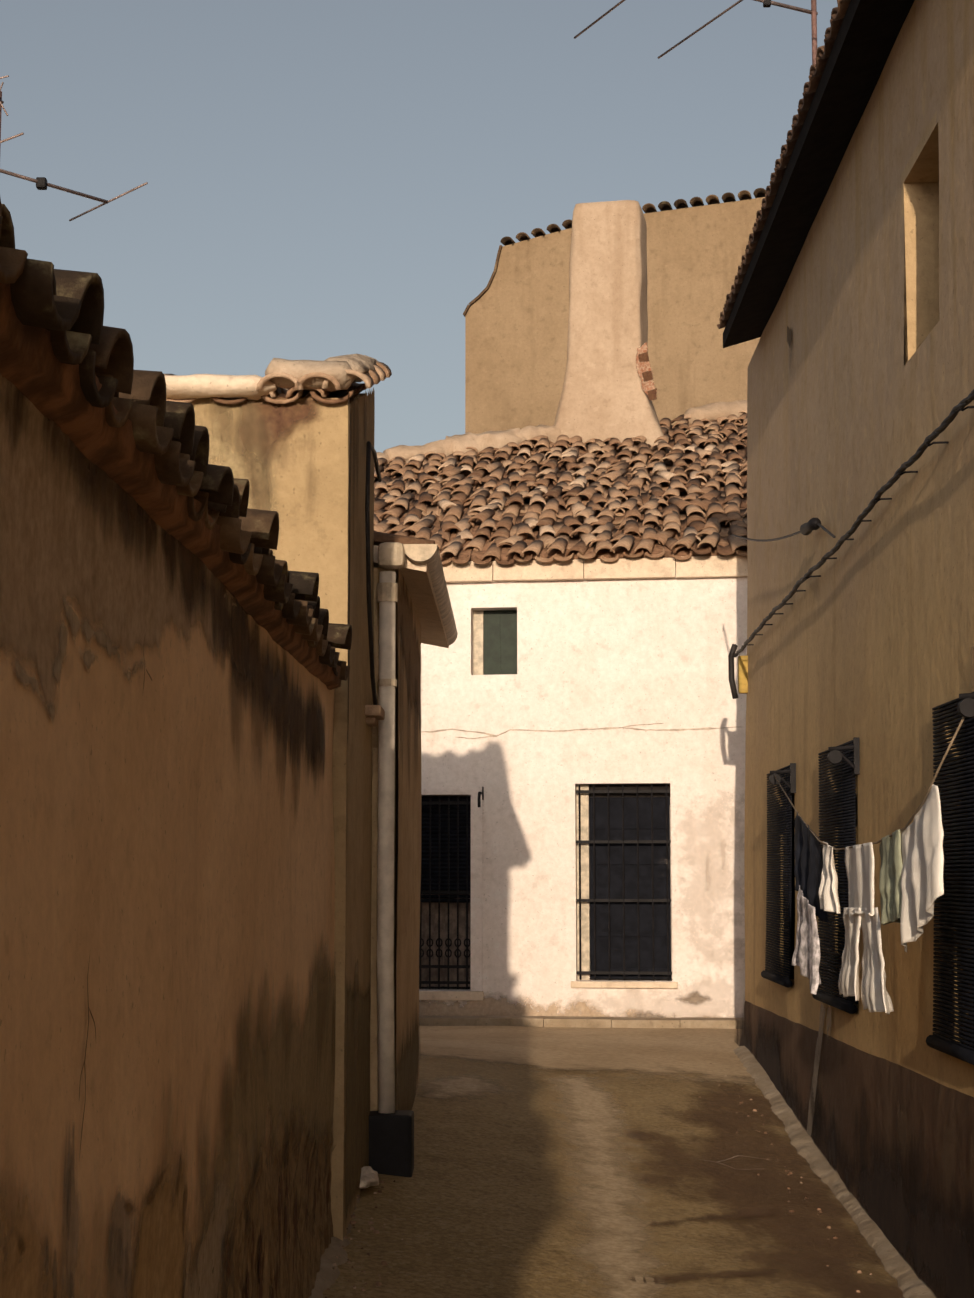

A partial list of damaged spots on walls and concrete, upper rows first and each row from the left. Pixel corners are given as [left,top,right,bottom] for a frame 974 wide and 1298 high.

flaking render [0,374,237,719]
crack [79,956,96,1158]
damp [44,1126,139,1298]
flaking render [125,1118,333,1298]
damp [162,965,370,1298]
damp [397,997,609,1110]
damp [628,1004,974,1298]